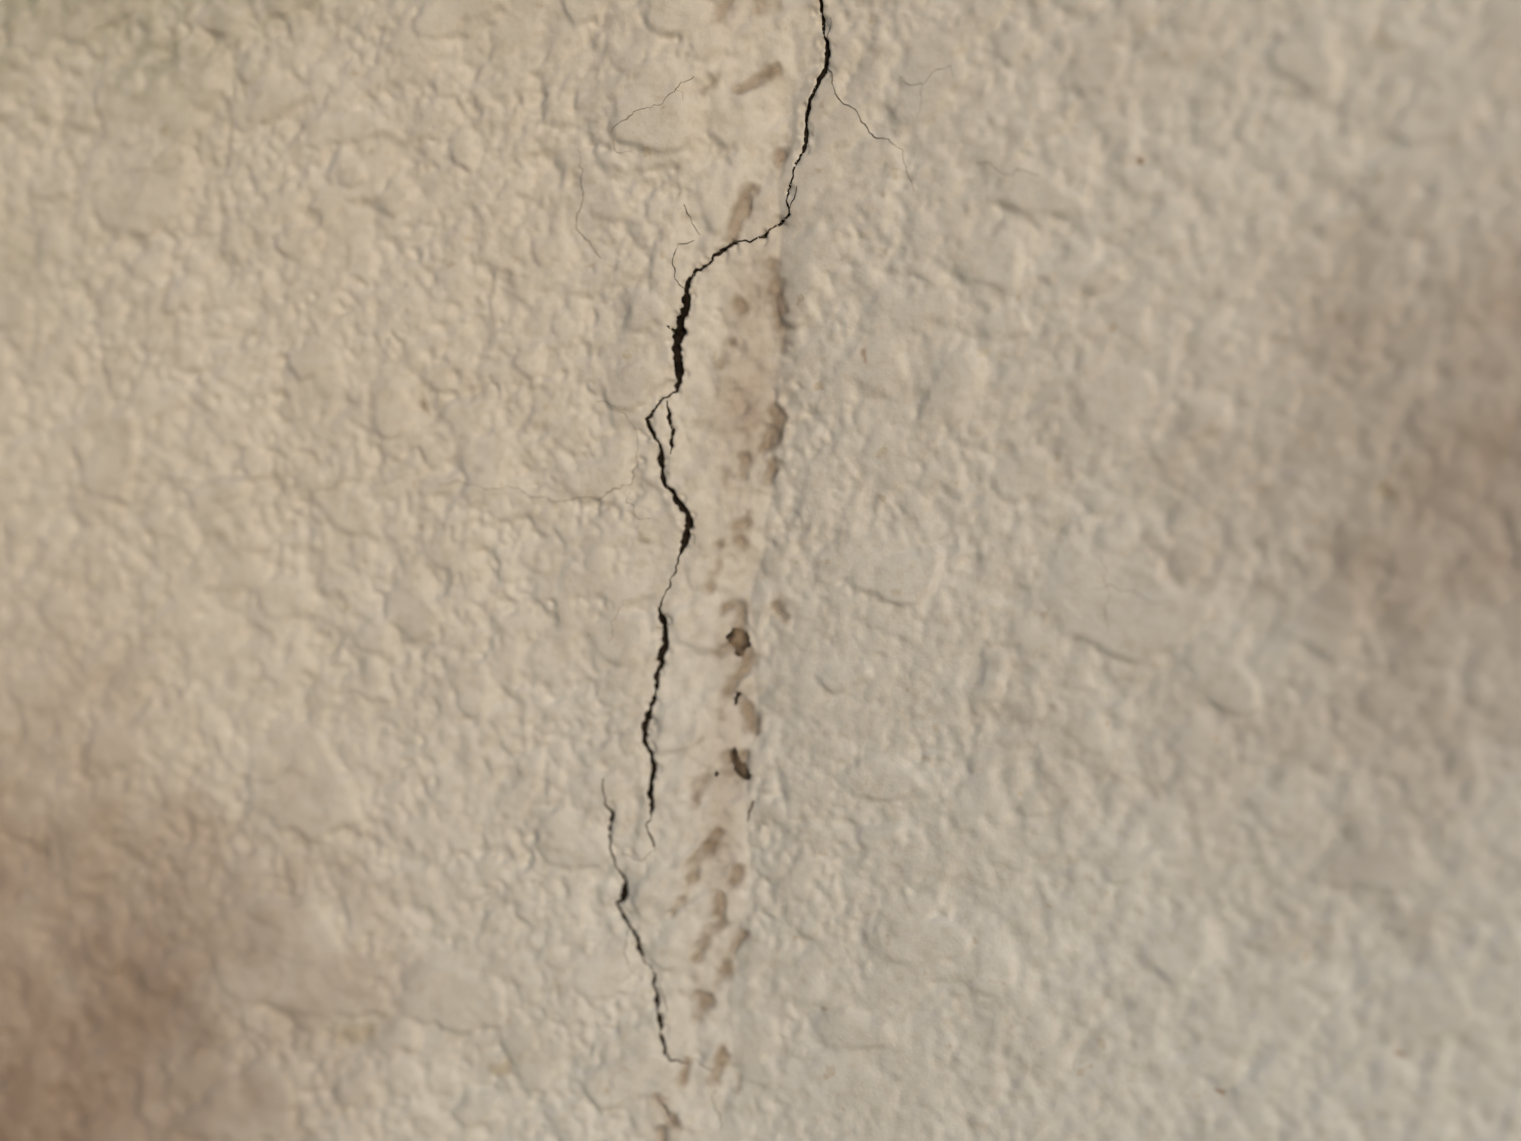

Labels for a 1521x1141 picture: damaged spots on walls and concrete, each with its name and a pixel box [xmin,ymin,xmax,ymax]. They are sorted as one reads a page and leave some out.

crack [0,0,914,1131]